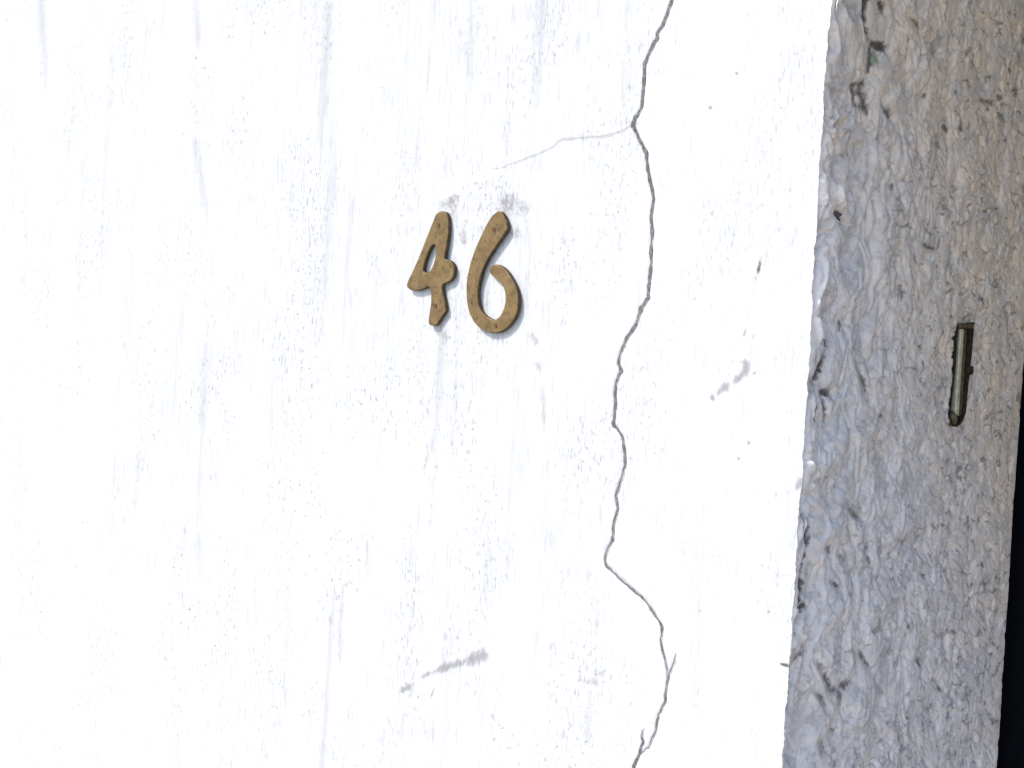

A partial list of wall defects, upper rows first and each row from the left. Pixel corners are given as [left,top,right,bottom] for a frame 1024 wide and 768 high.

crack [604,0,676,768]